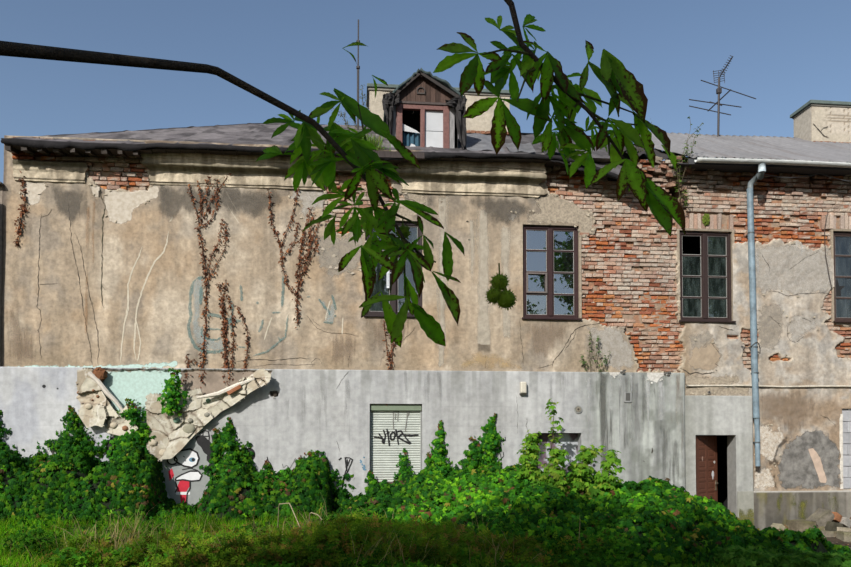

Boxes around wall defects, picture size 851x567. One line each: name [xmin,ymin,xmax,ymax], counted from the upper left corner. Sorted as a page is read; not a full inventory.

crack [37,192,106,362]
flaking render [12,151,159,224]
flaking render [288,172,425,277]
flaking render [528,166,749,396]
flaking render [638,156,851,360]
crack [520,323,599,368]
flaking render [727,304,788,371]
peeling [8,361,182,424]
water stain [600,373,611,460]